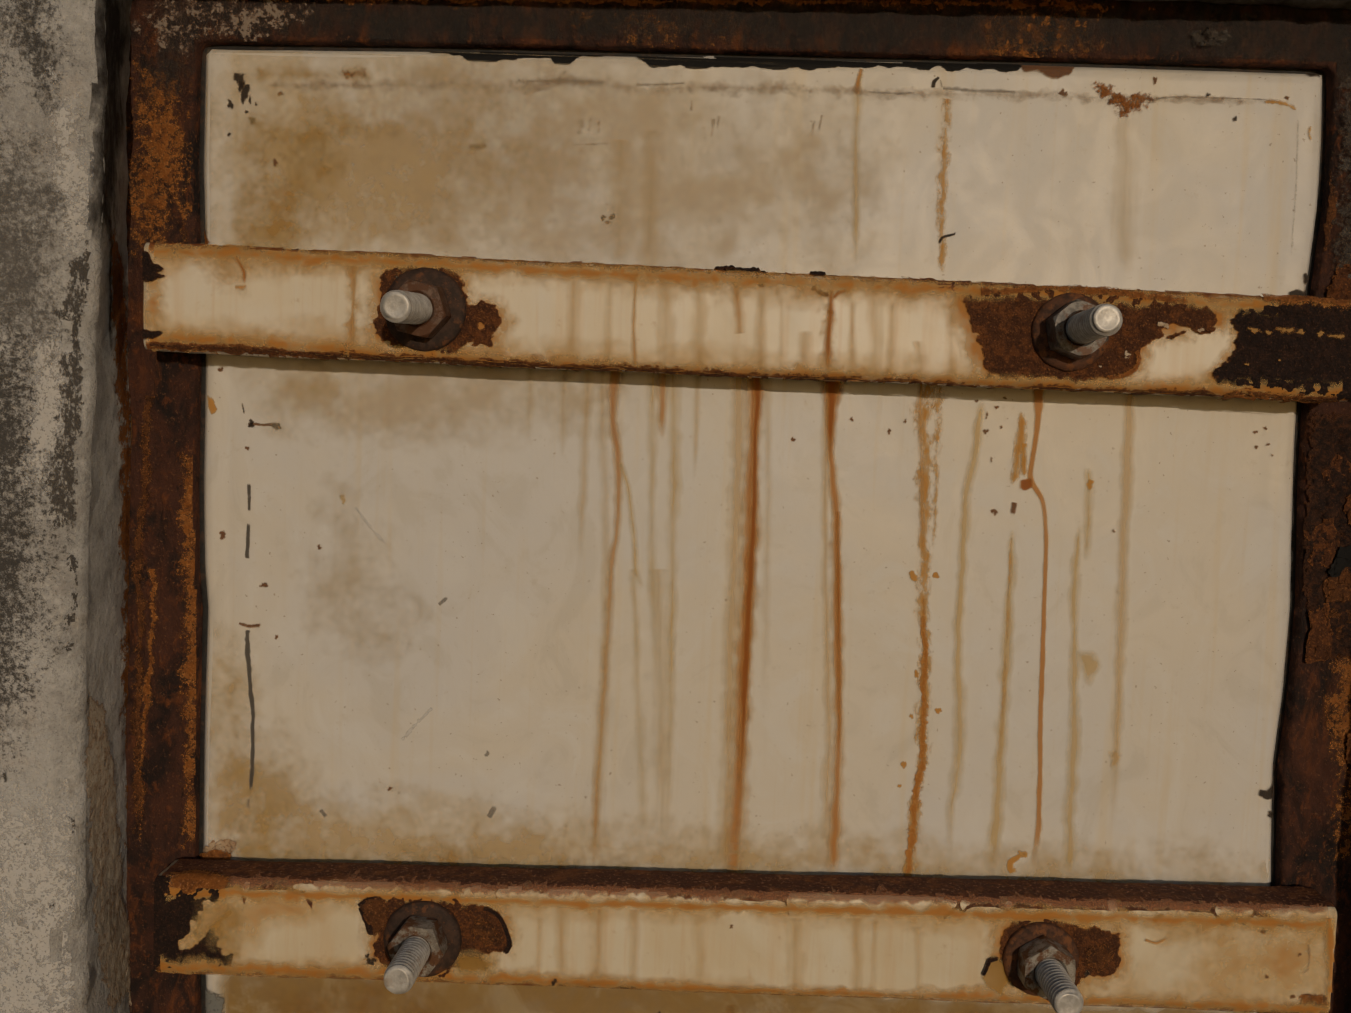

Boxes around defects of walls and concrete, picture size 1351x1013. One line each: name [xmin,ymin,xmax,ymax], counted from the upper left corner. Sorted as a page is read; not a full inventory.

corrosion [127,63,1351,403]
corrosion [108,228,158,848]
corrosion [146,311,1335,1013]
corrosion [1301,410,1351,860]
damp [223,974,1057,1013]